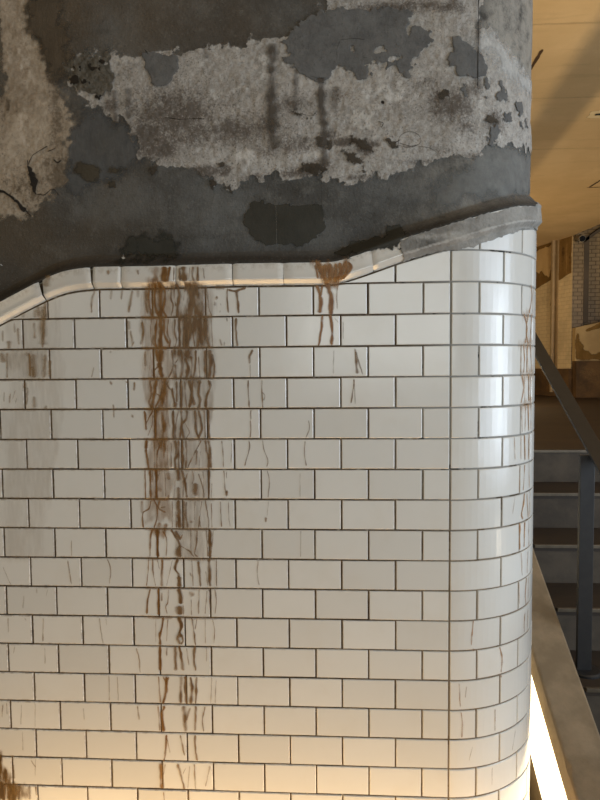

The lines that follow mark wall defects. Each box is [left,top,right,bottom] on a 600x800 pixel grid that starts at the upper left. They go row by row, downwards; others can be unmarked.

spalling [0,0,532,220]
water stain [267,44,279,149]
water stain [318,78,328,166]
crack [0,146,61,216]
water stain [243,200,326,247]
corrosion [315,260,353,346]
corrosion [130,266,246,795]